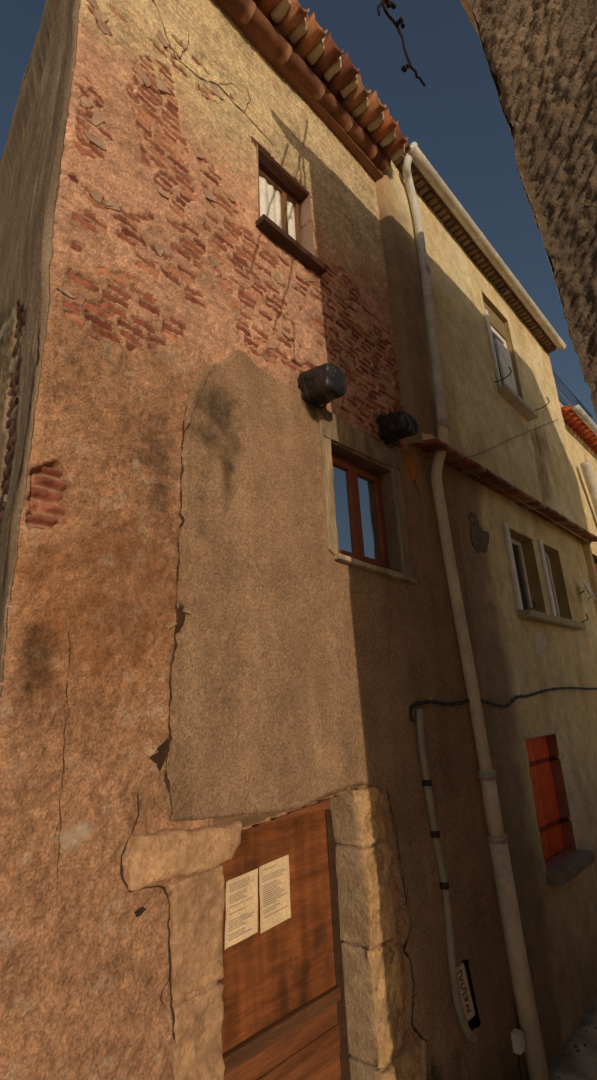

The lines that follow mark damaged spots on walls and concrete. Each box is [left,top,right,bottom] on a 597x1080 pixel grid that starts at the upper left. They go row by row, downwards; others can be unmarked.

crack [152,0,274,146]
flaking render [56,30,403,449]
flaking render [0,302,27,533]
flaking render [26,466,68,529]
crack [164,367,212,817]
crack [120,789,176,1049]
crack [386,789,428,1068]